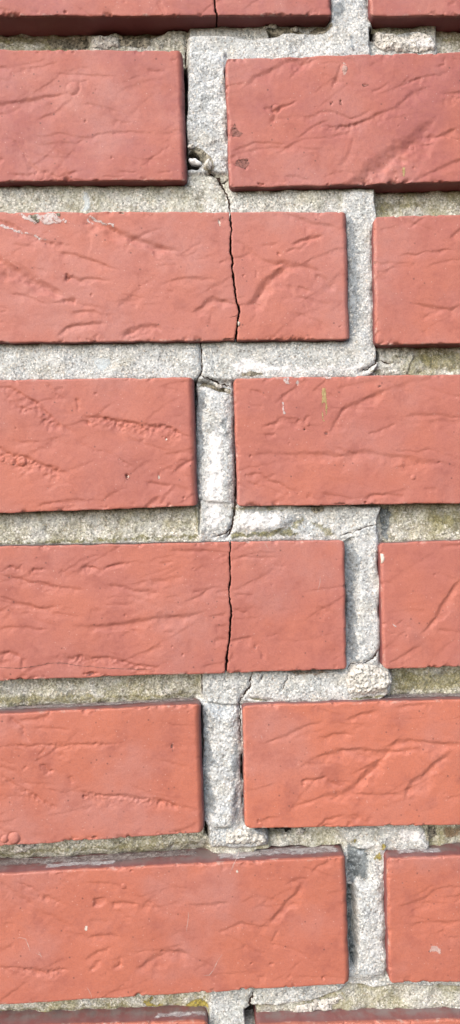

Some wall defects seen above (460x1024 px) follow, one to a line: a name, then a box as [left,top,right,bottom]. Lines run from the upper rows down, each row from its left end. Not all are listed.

crack [207,174,240,342]
crack [197,343,230,387]